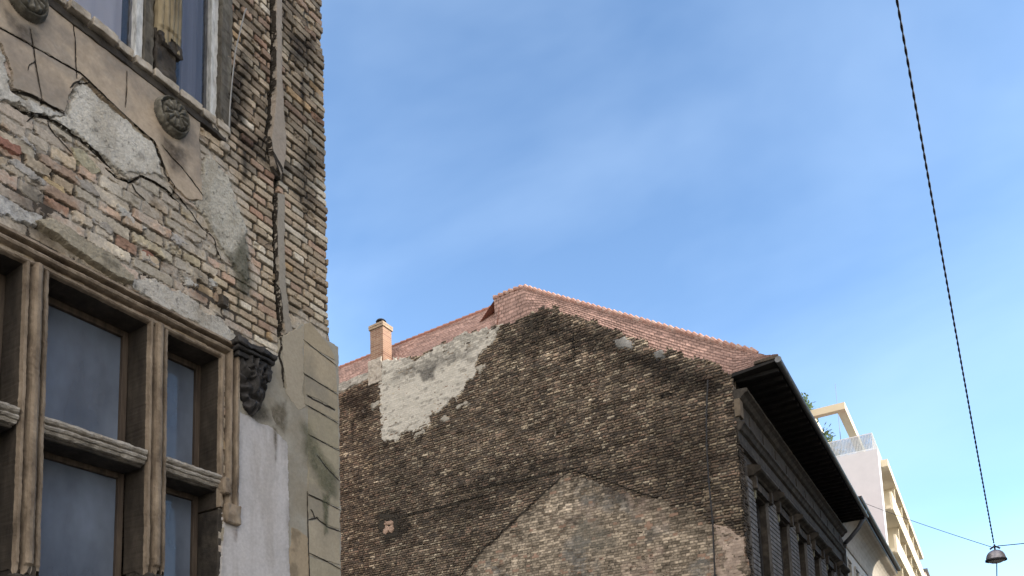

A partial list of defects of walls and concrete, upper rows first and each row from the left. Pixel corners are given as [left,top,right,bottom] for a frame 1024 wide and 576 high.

peeling [0,0,203,201]